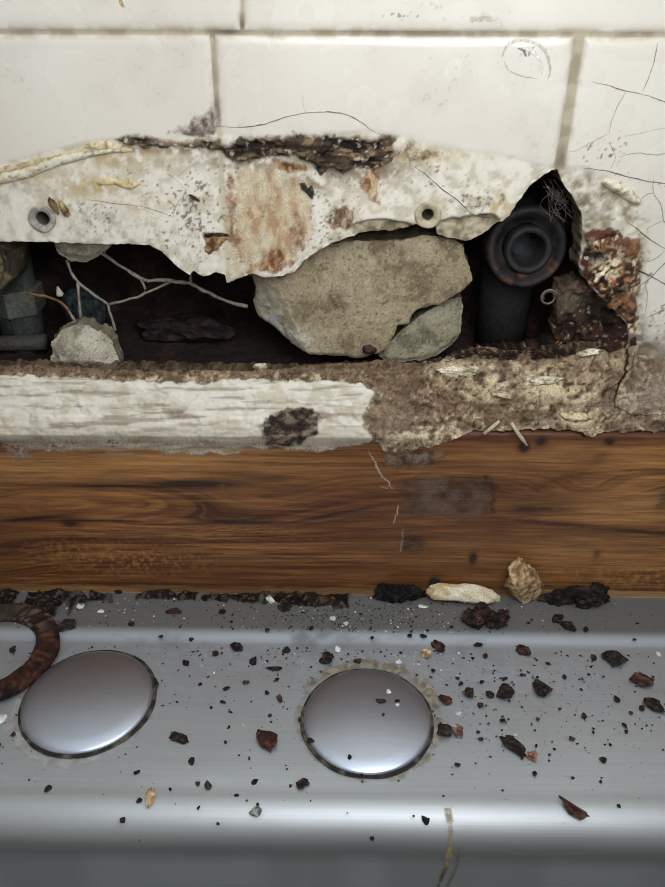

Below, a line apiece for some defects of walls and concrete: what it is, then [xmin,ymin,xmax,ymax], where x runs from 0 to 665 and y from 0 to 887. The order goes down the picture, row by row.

crack [595,42,665,102]
corrosion [360,166,379,202]
spalling [0,242,384,365]
spalling [203,233,231,255]
corrosion [227,160,311,274]
corrosion [327,206,353,229]
spalling [424,171,637,377]
corrosion [581,228,643,335]
crack [585,149,665,318]
peeling [523,376,563,386]
spalling [263,407,318,447]
peeling [560,410,592,422]